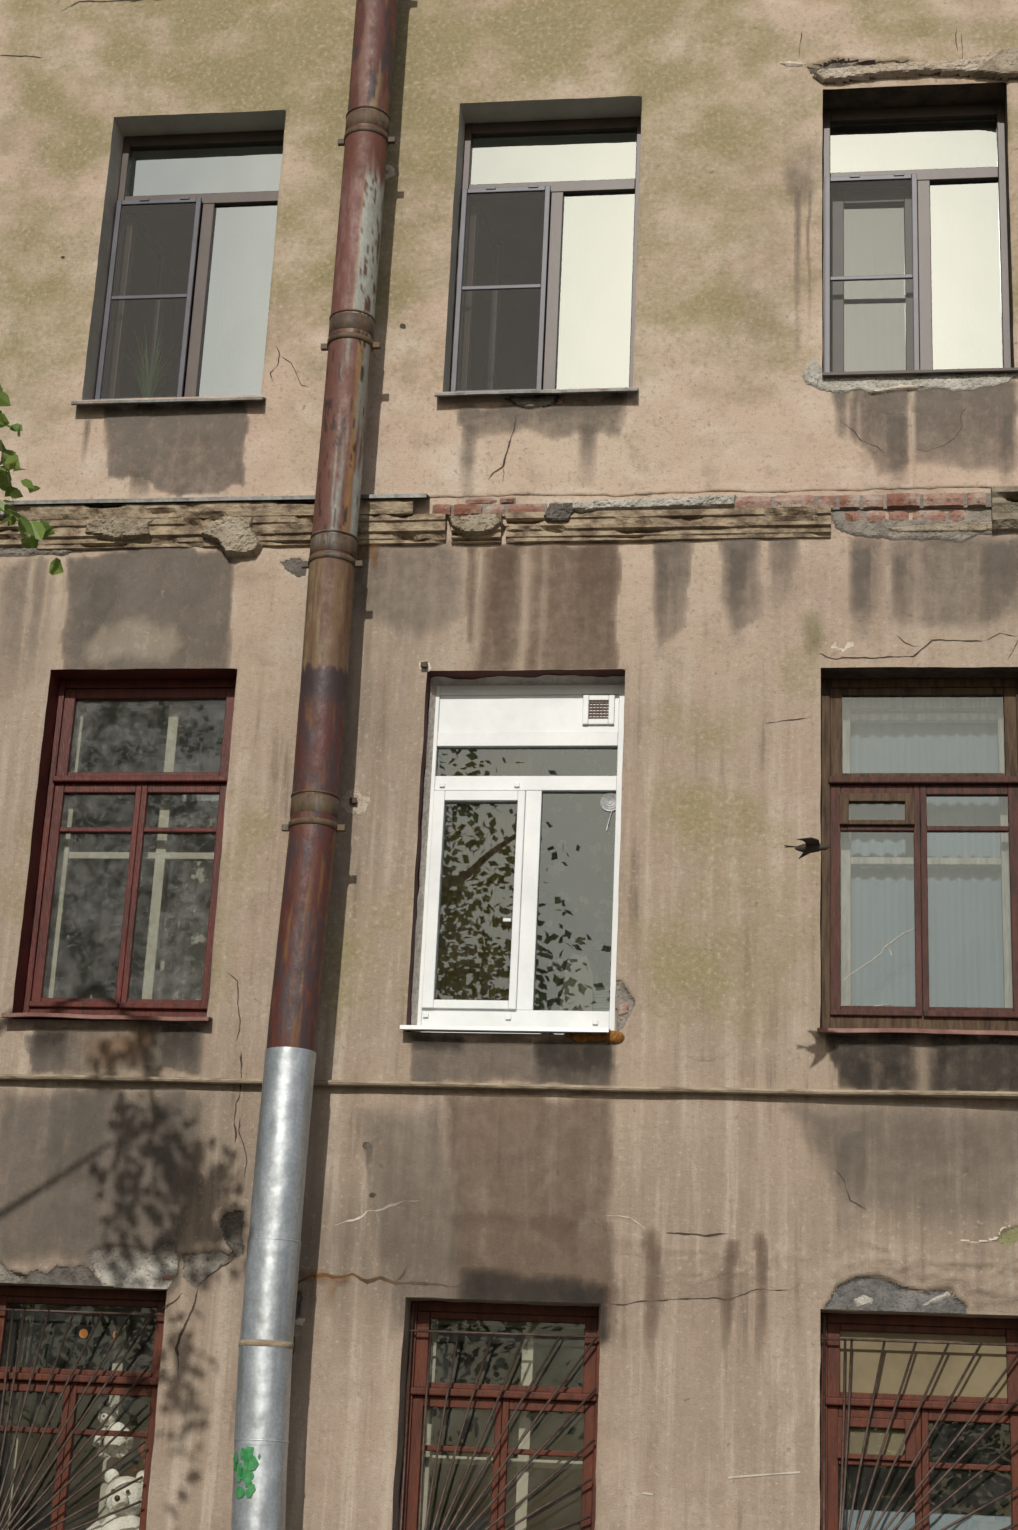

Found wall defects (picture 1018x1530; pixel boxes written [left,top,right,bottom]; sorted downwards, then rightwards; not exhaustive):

peeling [779,47,1018,85]
crack [489,427,515,478]
flaking render [432,492,1015,542]
damp [723,539,756,592]
damp [51,548,232,669]
damp [470,542,620,669]
crack [820,633,1018,659]
damp [412,1034,613,1340]
spalling [0,1210,244,1289]
peeling [961,1225,1018,1246]
crack [163,1259,233,1368]
spalling [824,1276,967,1313]